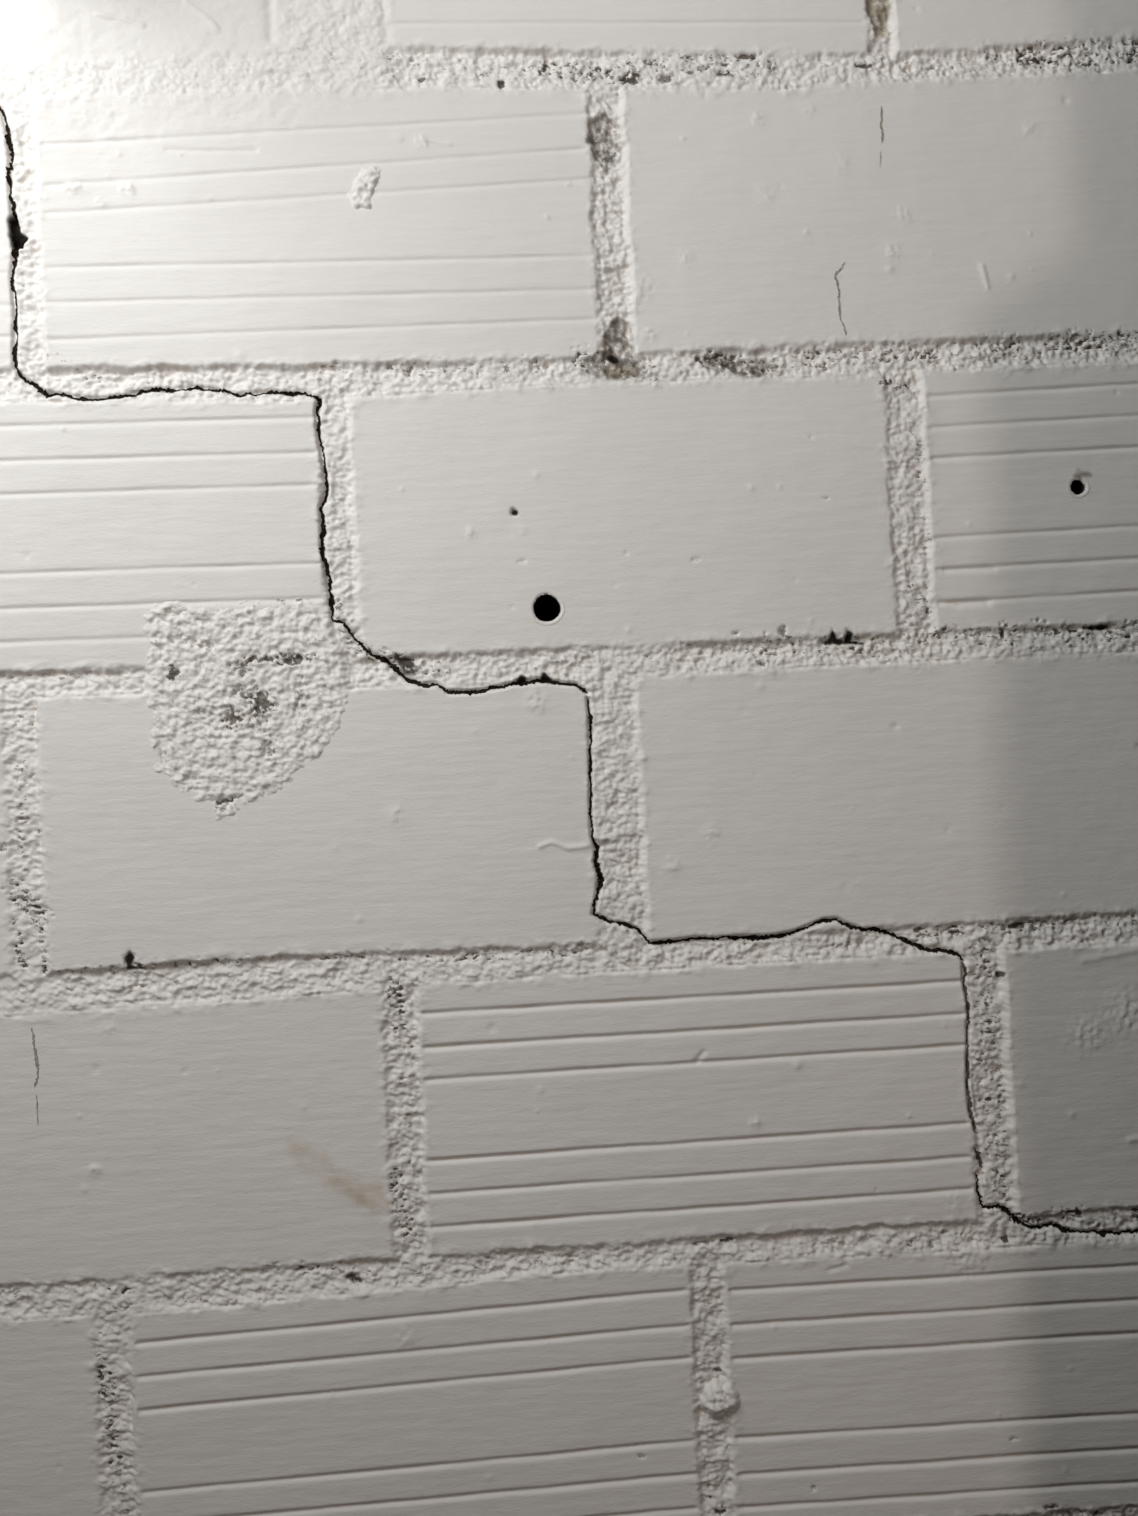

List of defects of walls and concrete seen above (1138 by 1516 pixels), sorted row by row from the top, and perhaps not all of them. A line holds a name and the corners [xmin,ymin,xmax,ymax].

crack [0,106,1138,1237]